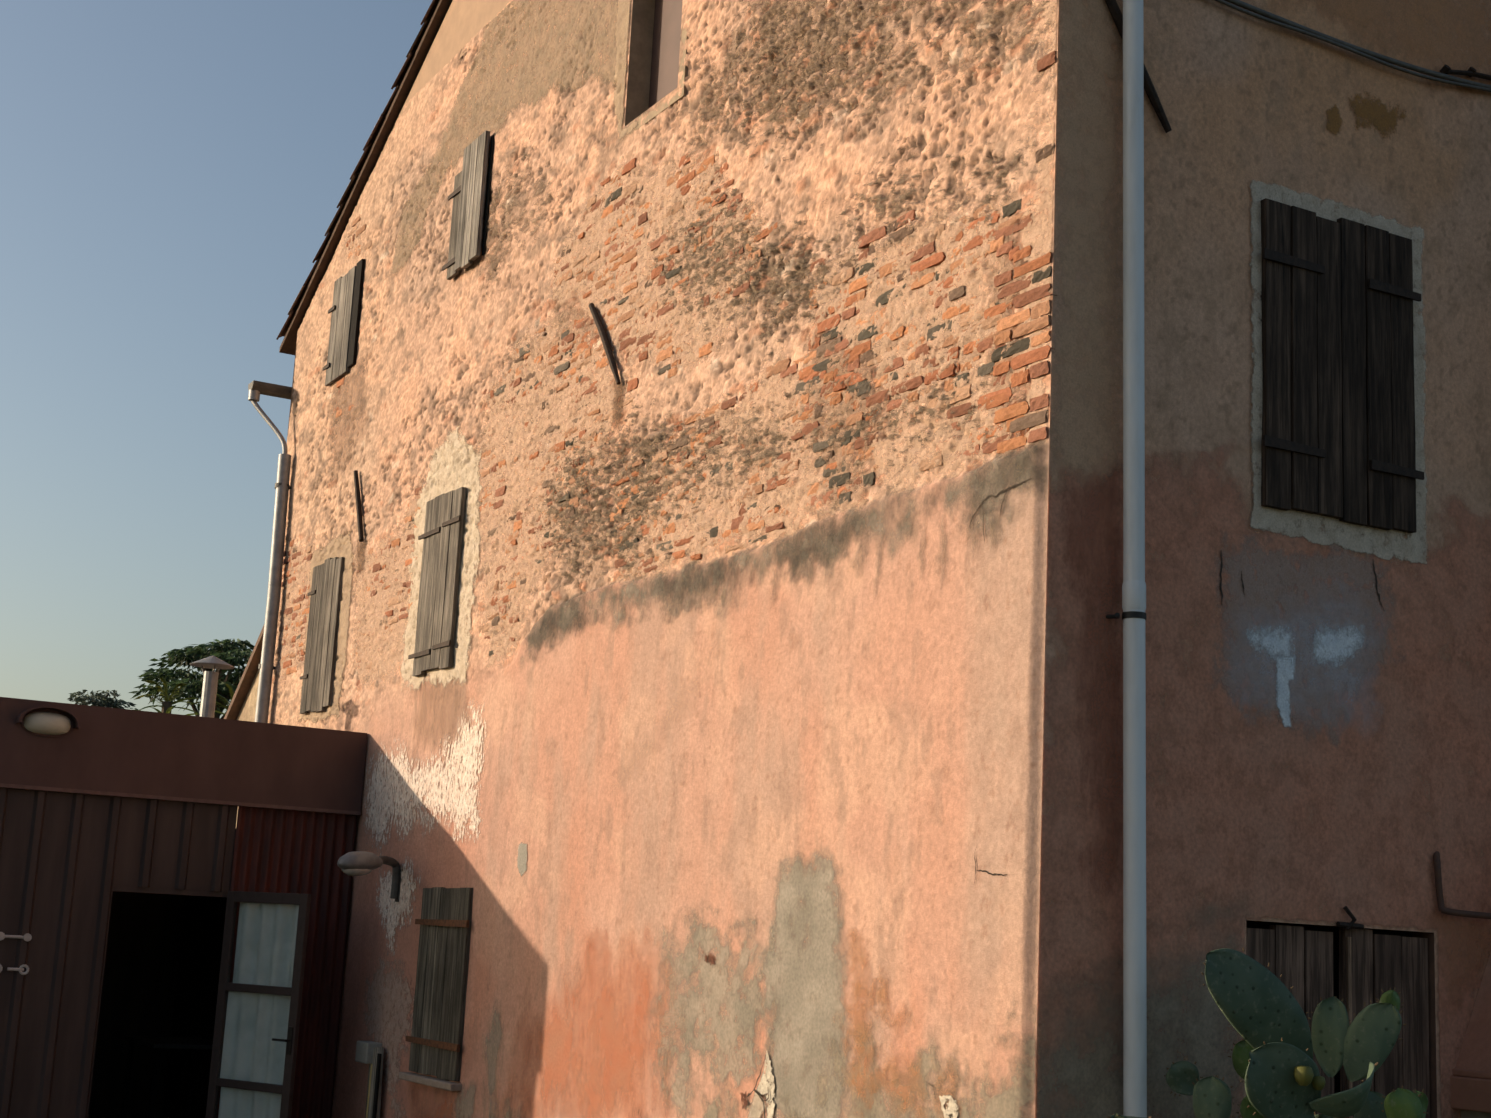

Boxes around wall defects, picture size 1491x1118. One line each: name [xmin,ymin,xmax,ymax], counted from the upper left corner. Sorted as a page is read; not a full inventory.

spalling [391,0,618,274]
leakage [528,491,915,653]
spalling [472,0,1123,1118]
leakage [933,443,1044,527]
crack [969,478,1032,542]
peeling [363,700,486,955]
crack [974,849,1007,884]
peeling [1145,446,1491,1118]
leakage [817,996,1123,1118]
leakage [1147,959,1242,1118]